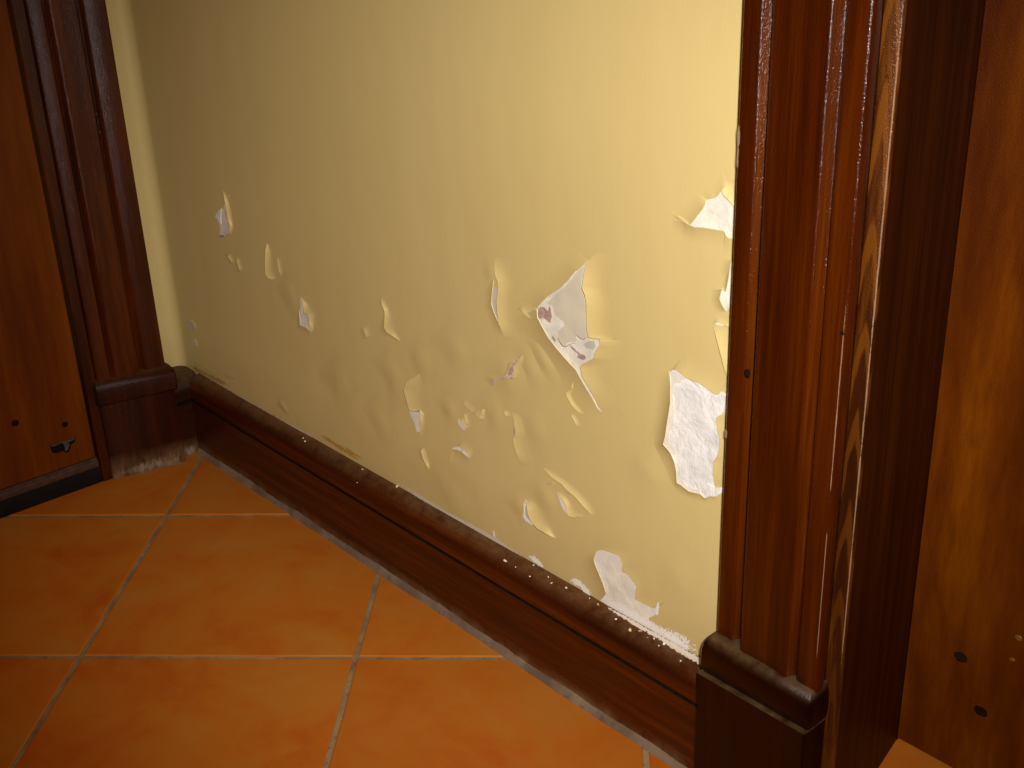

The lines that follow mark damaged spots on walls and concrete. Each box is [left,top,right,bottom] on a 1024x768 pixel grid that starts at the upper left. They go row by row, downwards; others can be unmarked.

peeling [215,191,233,238]
peeling [296,298,316,337]
peeling [484,250,625,427]
peeling [651,171,736,503]
peeling [403,373,430,470]
peeling [523,499,556,538]
peeling [543,468,595,518]
peeling [582,545,664,622]